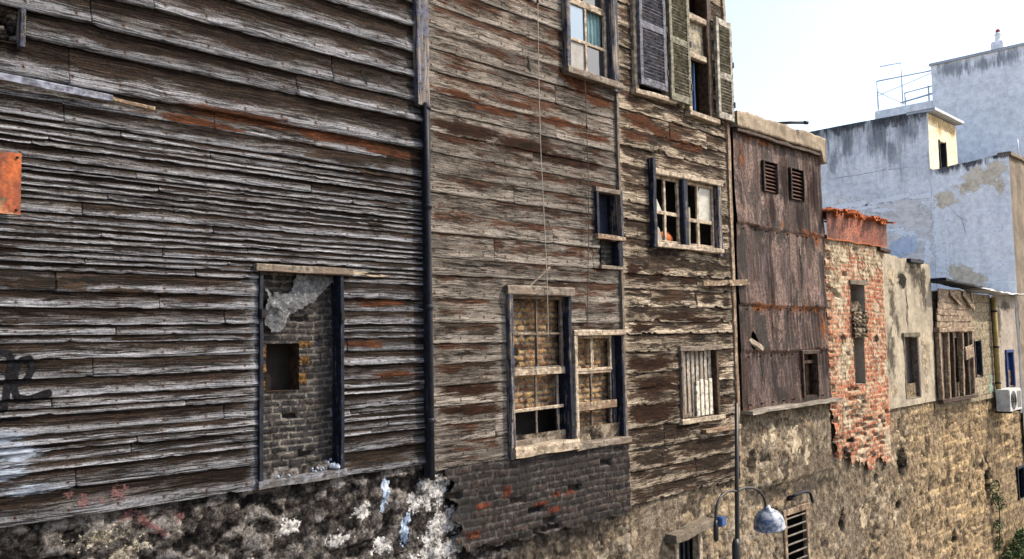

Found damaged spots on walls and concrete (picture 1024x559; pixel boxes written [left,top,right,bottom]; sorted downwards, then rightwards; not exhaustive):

water stain [810,112,926,136]
peeling [824,160,1008,304]
spalling [265,274,334,332]
peeling [840,331,851,380]
peeling [838,395,866,458]
peeling [324,529,355,548]
peeling [349,501,370,521]
peeling [370,536,392,555]
peeling [406,471,481,559]